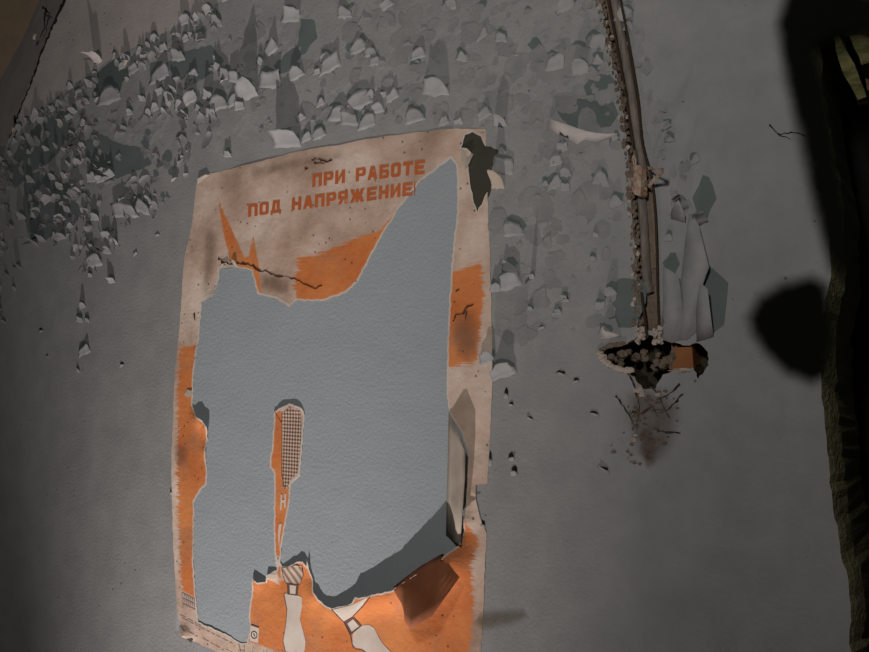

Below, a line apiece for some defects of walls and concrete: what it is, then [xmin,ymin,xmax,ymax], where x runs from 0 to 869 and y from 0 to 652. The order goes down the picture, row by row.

peeling [76,341,91,373]
peeling [0,0,653,346]
peeling [479,348,517,407]
peeling [585,91,728,465]